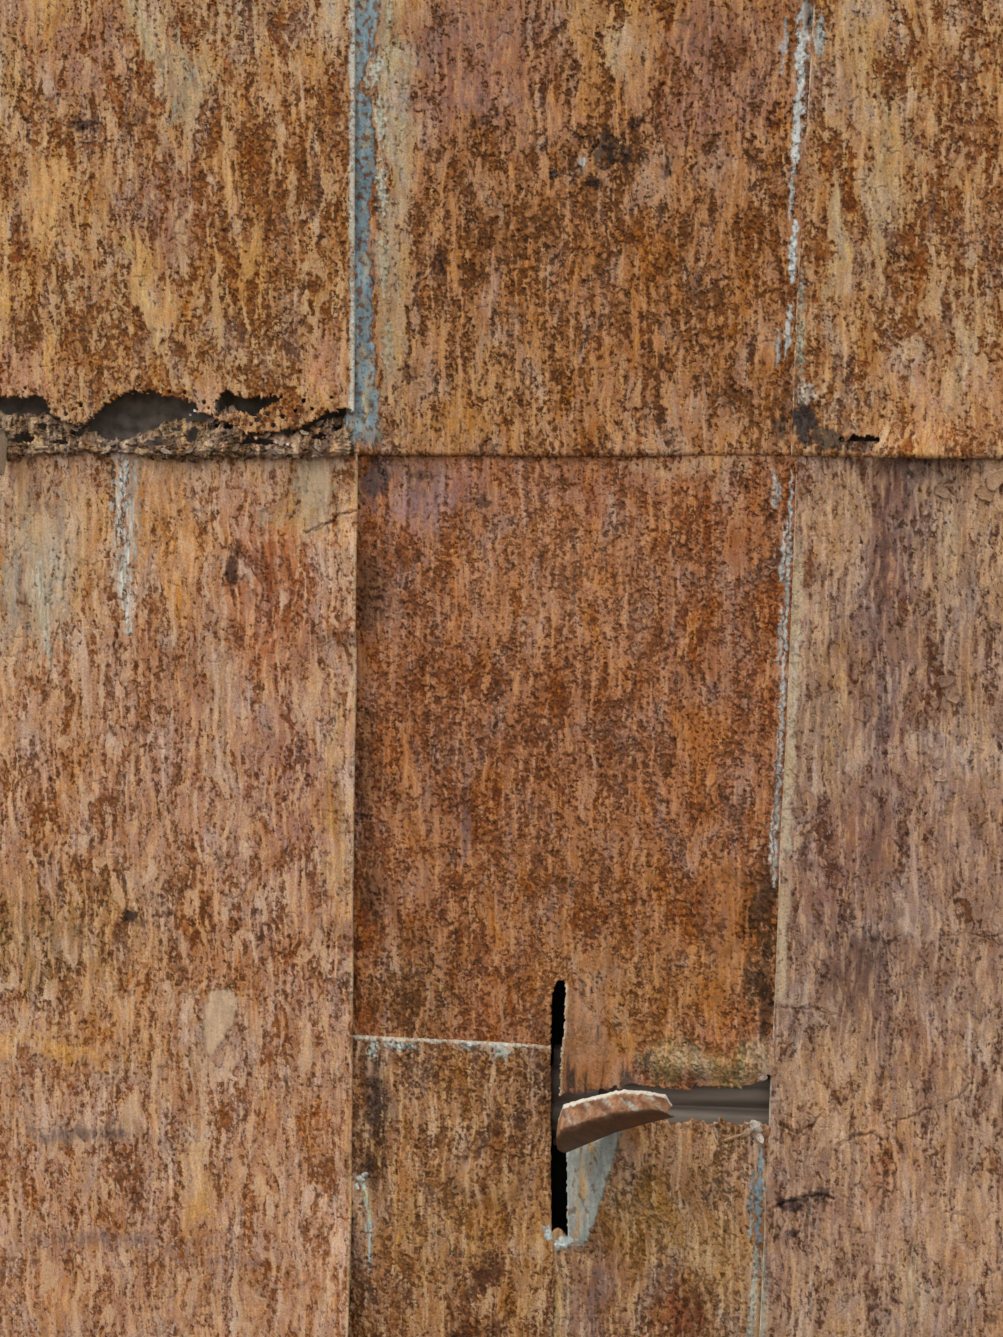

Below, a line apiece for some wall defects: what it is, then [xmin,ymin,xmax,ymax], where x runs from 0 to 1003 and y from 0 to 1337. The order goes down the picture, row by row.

corrosion [67,115,99,132]
corrosion [579,115,645,190]
peeling [97,433,205,456]
corrosion [772,401,854,451]
water stain [109,453,140,634]
corrosion [225,539,243,584]
corrosion [123,909,138,922]
corrosion [759,940,775,1037]
corrosion [362,1058,384,1174]
peeling [543,1131,621,1251]
corrosion [779,1187,834,1212]
corrosion [471,1266,497,1291]